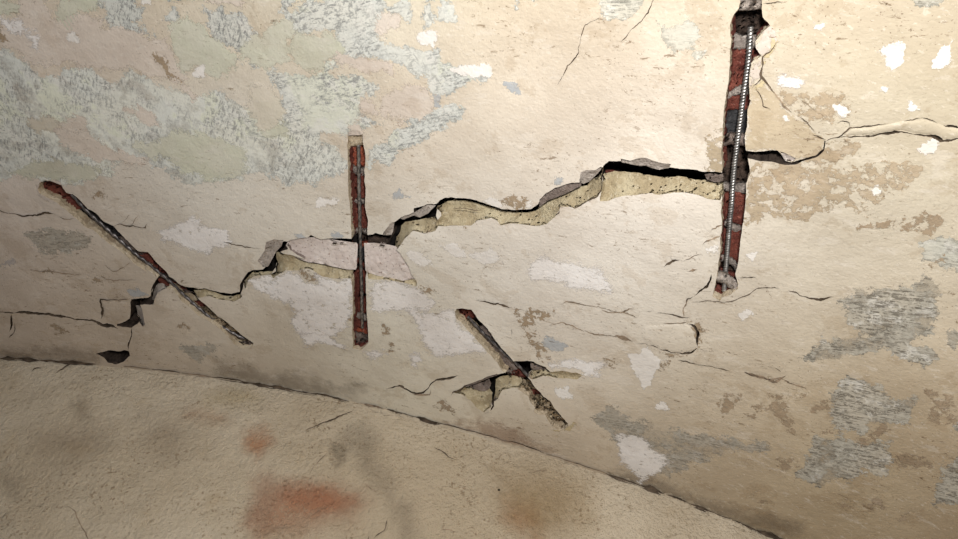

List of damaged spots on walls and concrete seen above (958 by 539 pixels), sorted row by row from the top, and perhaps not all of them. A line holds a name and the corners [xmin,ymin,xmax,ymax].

peeling [599,0,644,21]
peeling [914,0,944,8]
peeling [0,0,491,204]
crack [748,42,958,165]
crack [1,211,70,220]
crack [186,159,724,296]
spalling [194,128,724,302]
crack [0,263,782,539]
spalling [433,307,582,415]
crack [553,225,834,388]
peeling [590,375,958,508]